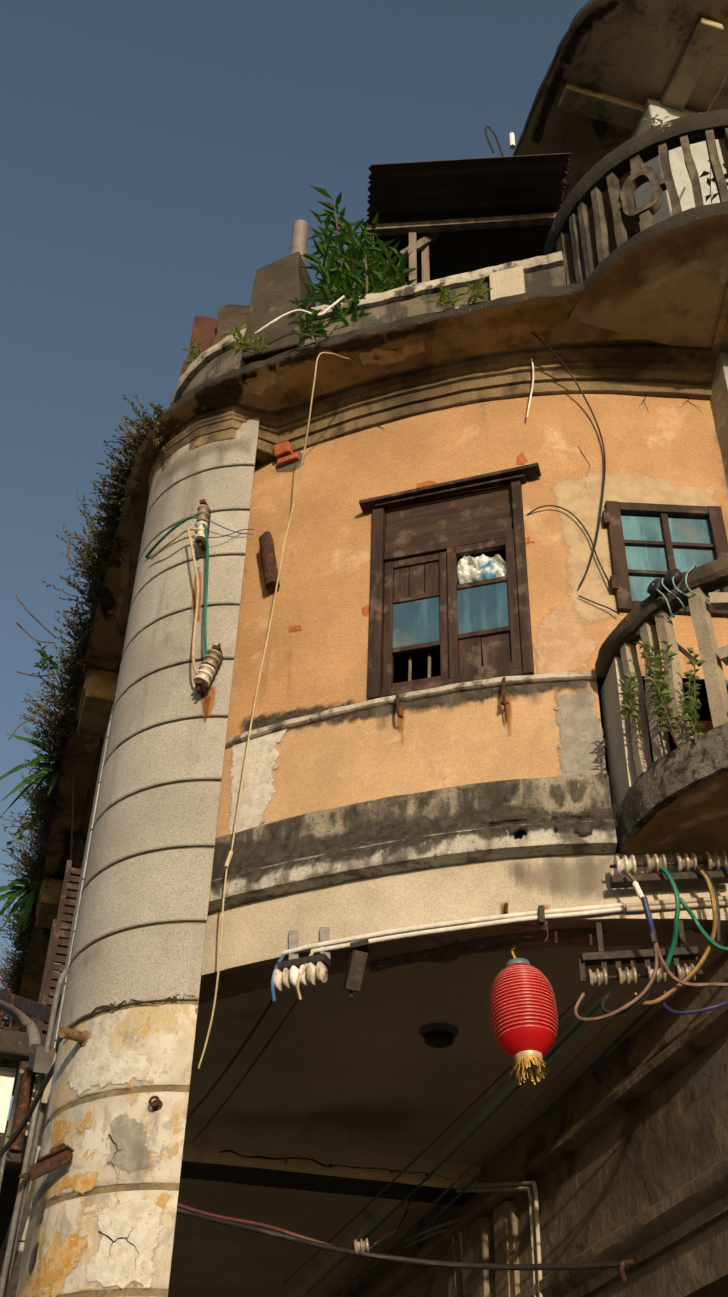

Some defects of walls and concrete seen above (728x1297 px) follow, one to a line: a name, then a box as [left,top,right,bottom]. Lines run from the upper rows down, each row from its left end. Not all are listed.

water stain [532,0,619,143]
rust [192,568,201,620]
rust [202,687,215,722]
peeling [229,729,287,834]
water stain [211,780,617,894]
peeling [67,1035,151,1097]
peeling [50,1108,94,1146]
peeling [42,1114,152,1201]
peeling [19,1198,164,1297]
crack [98,1228,139,1270]